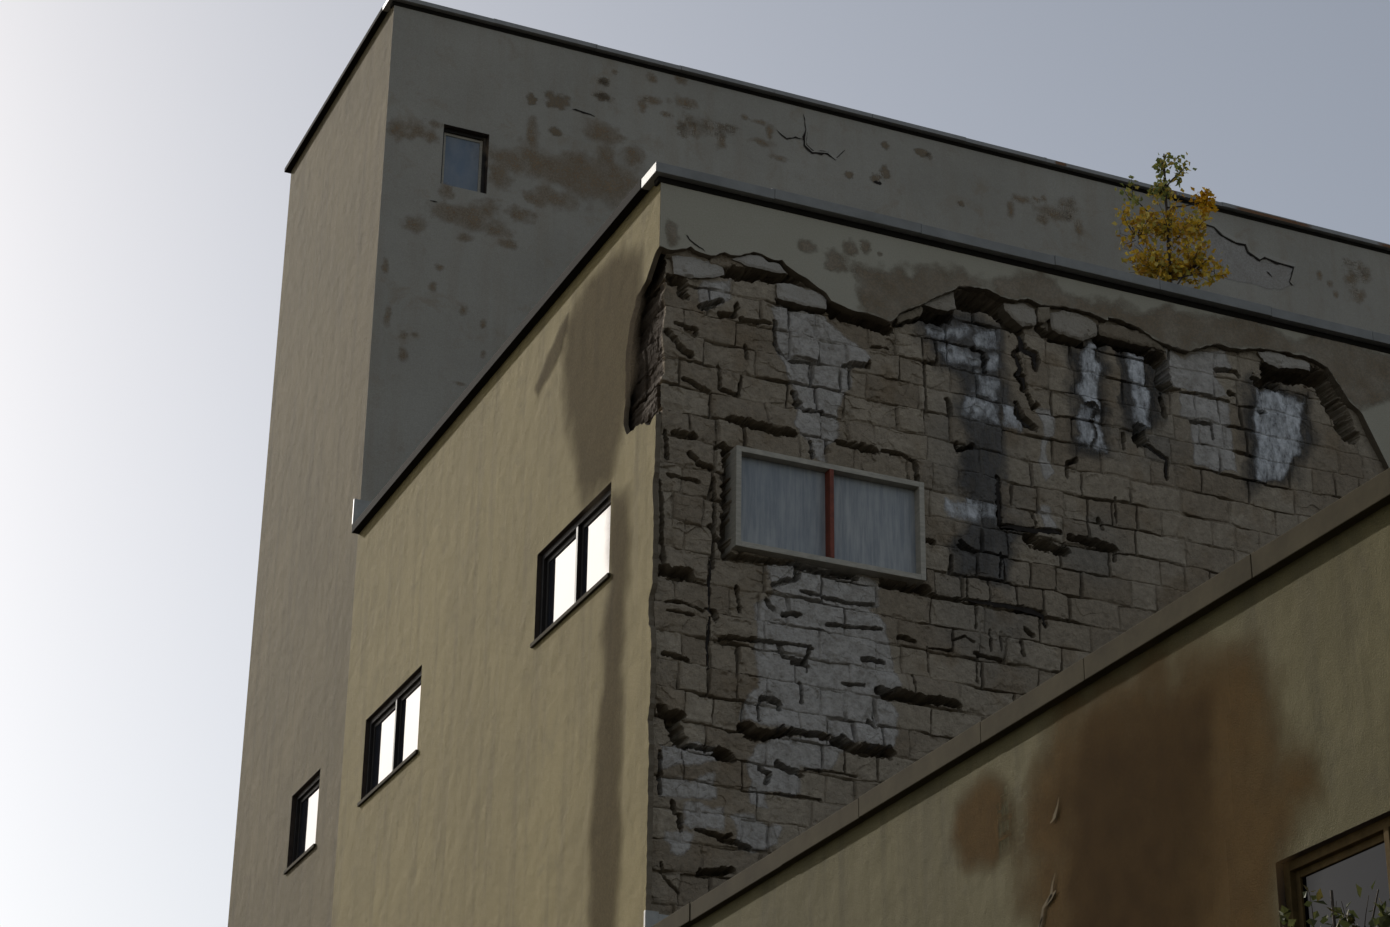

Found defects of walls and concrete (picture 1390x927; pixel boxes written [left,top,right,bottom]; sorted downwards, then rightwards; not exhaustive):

water stain [441,92,640,247]
crack [777,114,845,160]
flaking render [1120,215,1293,289]
crack [1199,217,1296,286]
spalling [629,249,1390,915]